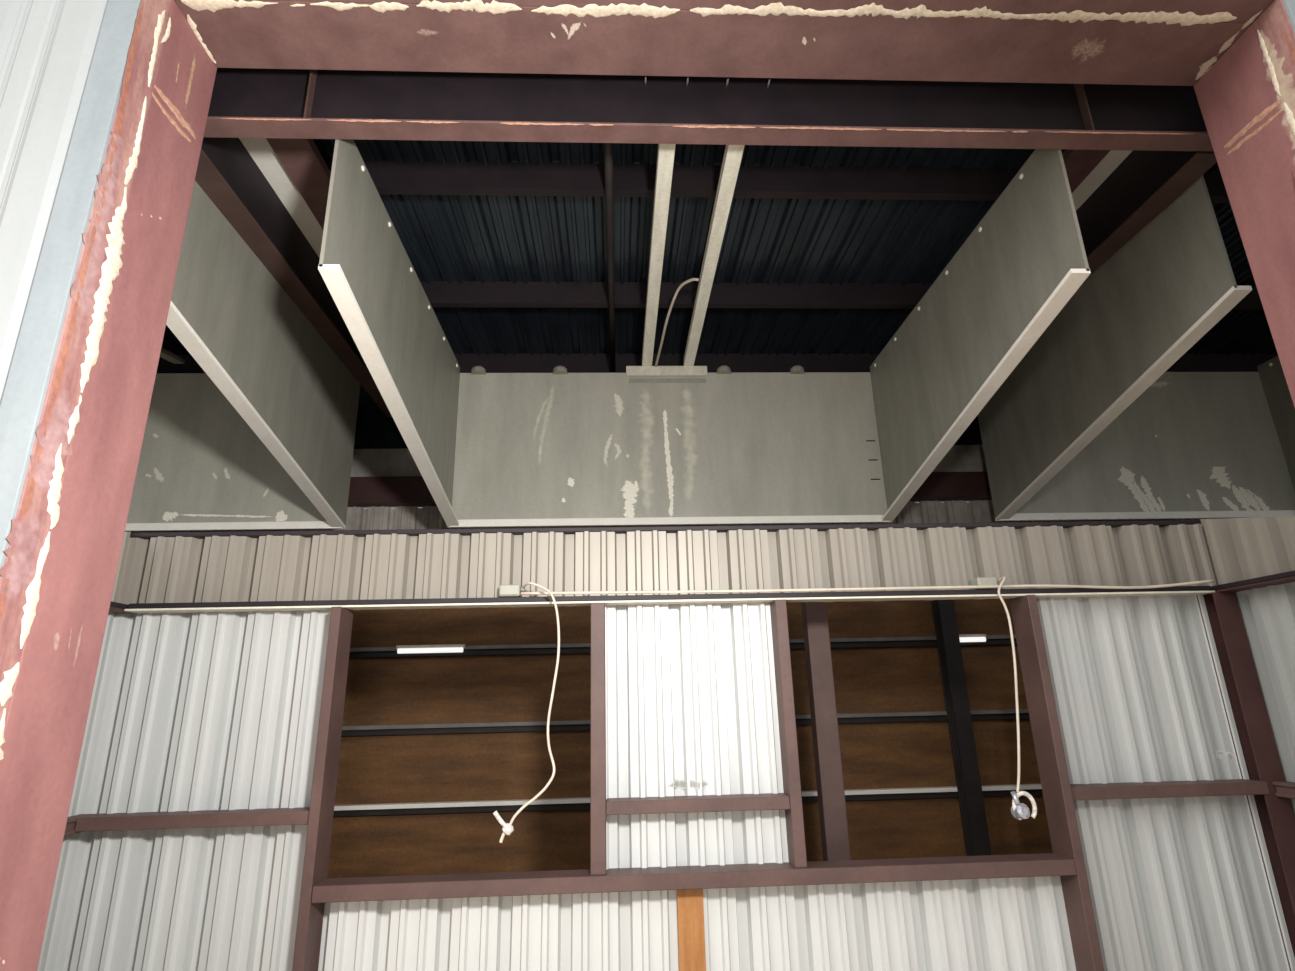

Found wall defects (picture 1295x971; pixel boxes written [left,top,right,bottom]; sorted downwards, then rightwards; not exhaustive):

peeling [0,10,196,760]
peeling [181,0,1295,165]